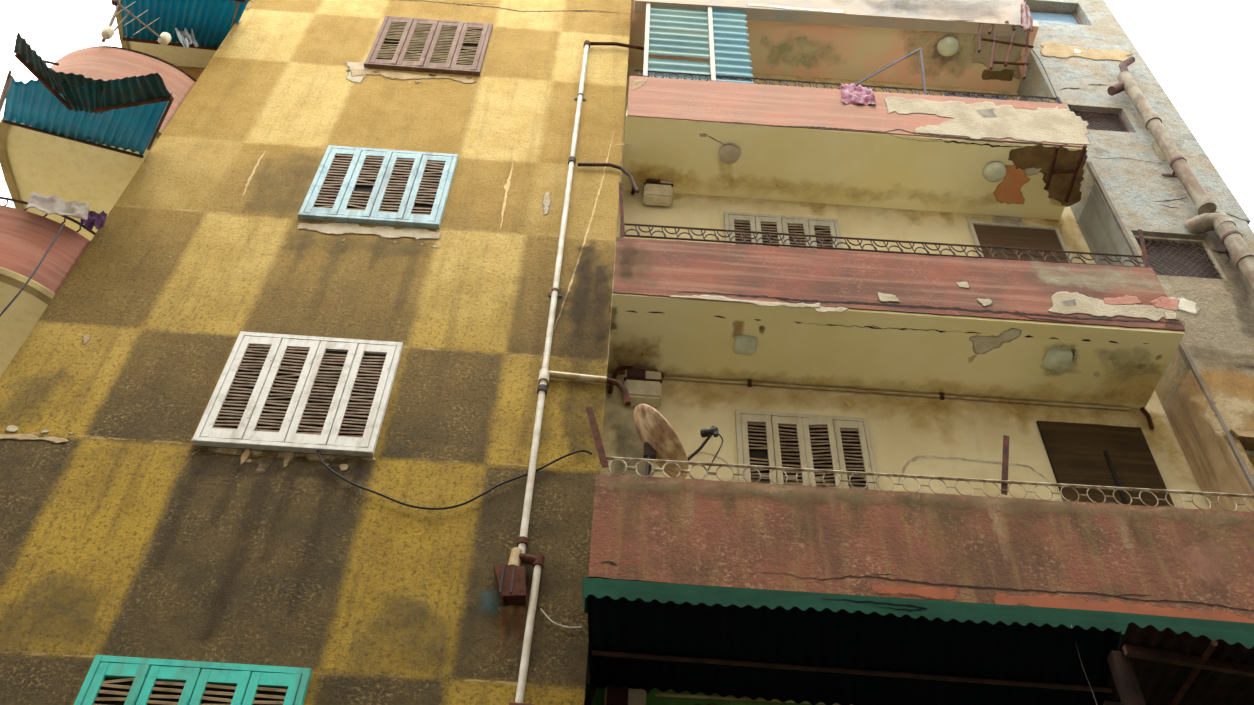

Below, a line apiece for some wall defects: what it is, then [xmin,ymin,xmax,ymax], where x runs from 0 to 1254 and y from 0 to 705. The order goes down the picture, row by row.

peeling [884,96,1091,225]
peeling [1048,291,1200,330]
spalling [970,328,1021,354]
water stain [235,448,291,478]
crack [769,572,1254,611]